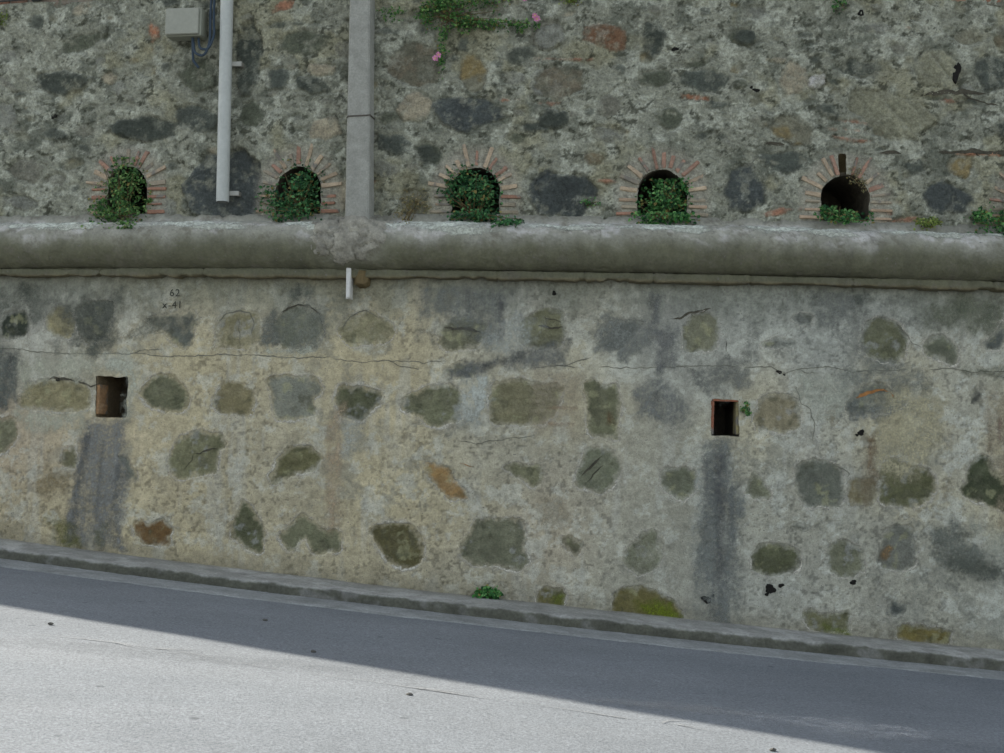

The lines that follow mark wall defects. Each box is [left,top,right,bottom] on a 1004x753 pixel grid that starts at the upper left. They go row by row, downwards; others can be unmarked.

damp [0,286,136,550]
crack [538,323,920,439]
crack [930,366,1004,374]
damp [694,441,745,623]